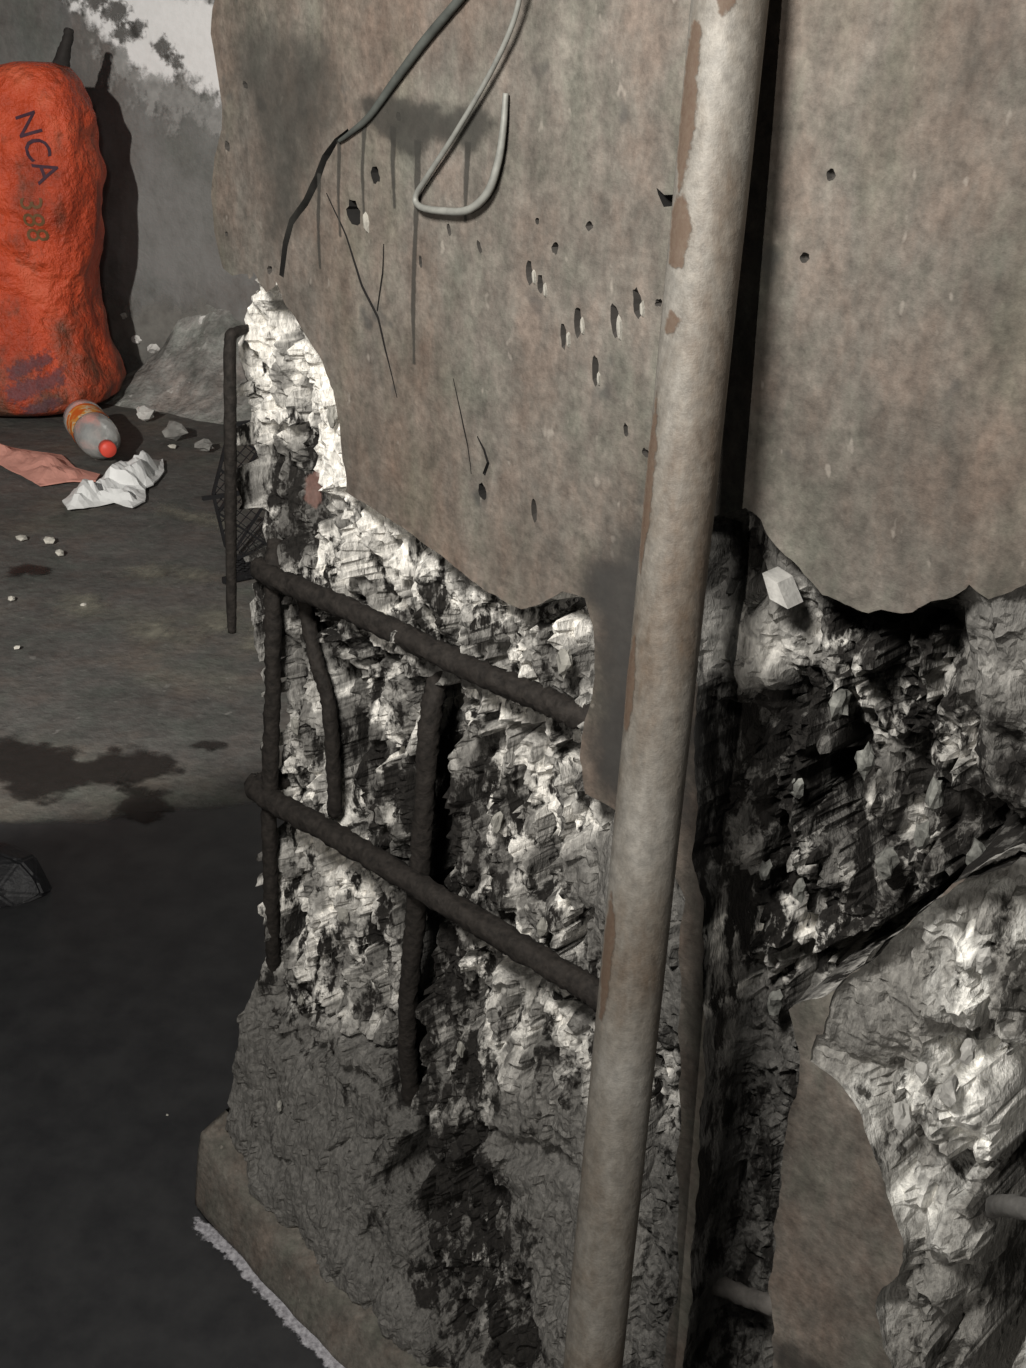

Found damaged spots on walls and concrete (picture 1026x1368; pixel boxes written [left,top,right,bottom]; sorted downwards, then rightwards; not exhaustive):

corrosion [718,0,735,15]
crack [279,129,397,397]
spalling [526,261,547,297]
spalling [610,287,645,341]
corrosion [665,310,679,333]
corrosion [669,20,701,268]
spalling [218,278,615,1368]
spalling [623,508,1026,1368]